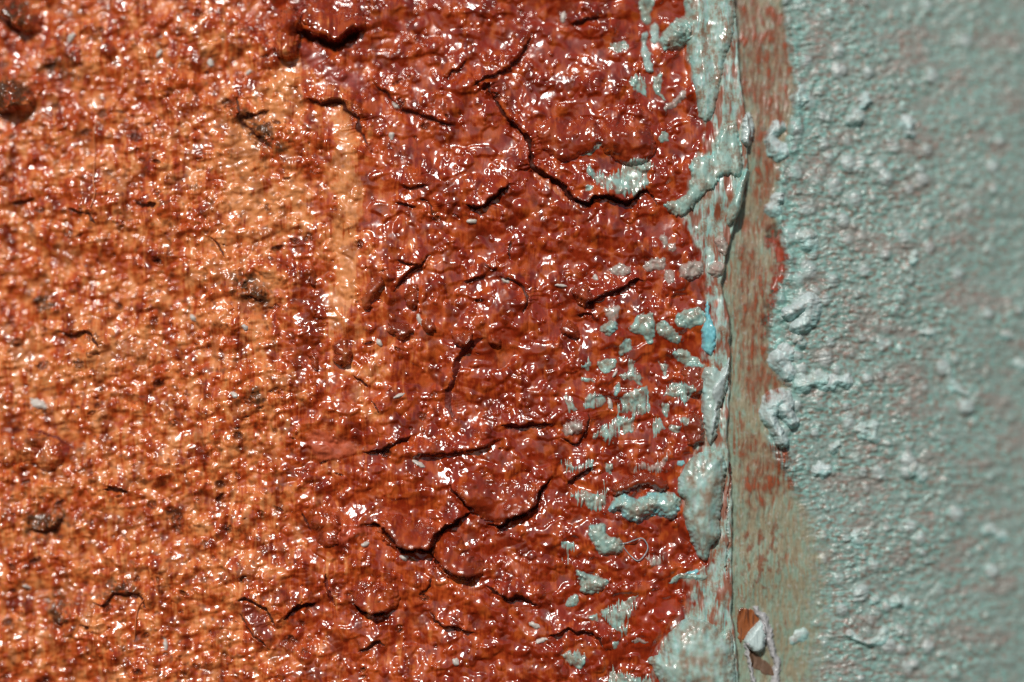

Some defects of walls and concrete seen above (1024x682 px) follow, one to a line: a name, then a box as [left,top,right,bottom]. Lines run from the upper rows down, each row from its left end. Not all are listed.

corrosion [739,0,793,124]
crack [309,99,368,144]
crack [447,33,658,206]
peeling [741,112,755,147]
peeling [726,169,750,226]
corrosion [752,130,778,211]
corrosion [740,226,789,402]
crack [362,414,590,457]
crack [398,468,592,633]
crack [238,574,384,650]
spalling [625,584,682,650]
peeling [737,605,781,682]